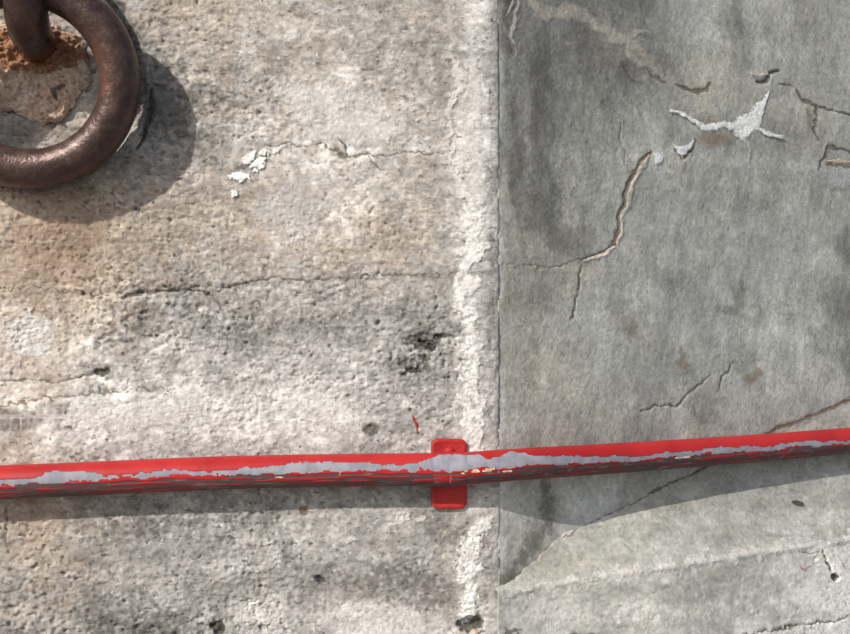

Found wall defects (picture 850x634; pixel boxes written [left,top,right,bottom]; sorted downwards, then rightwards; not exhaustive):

crack [506,0,712,94]
crack [796,90,849,141]
crack [268,137,442,171]
crack [503,115,652,319]
crack [0,256,456,311]
crack [640,359,736,412]
crack [765,397,850,434]
crack [536,466,709,558]
crack [799,551,839,581]